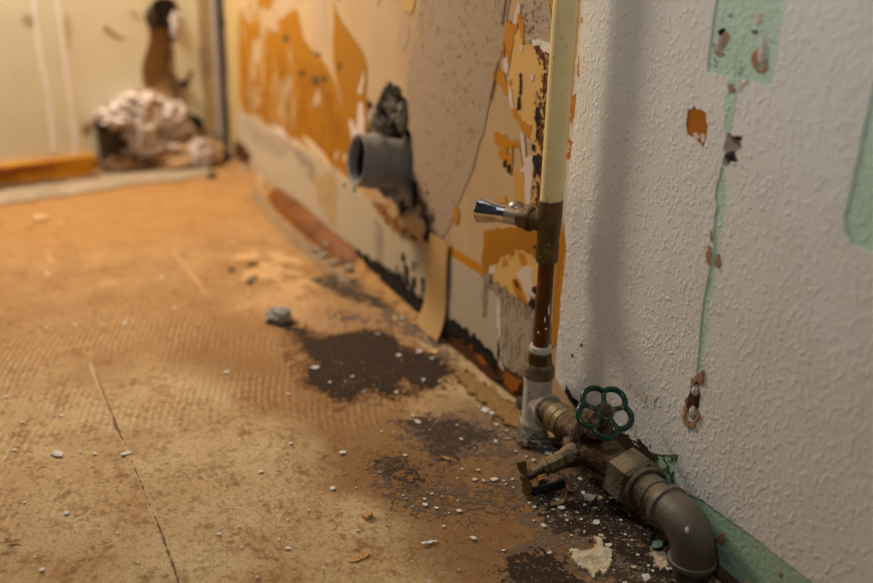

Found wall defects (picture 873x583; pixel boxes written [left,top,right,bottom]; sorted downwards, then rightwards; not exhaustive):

spalling [136,0,207,138]
peeling [238,0,390,176]
flaking render [372,182,427,240]
peeling [448,226,538,308]
peeling [493,3,549,205]
corrosion [531,41,549,208]
peeling [552,0,584,349]
leakage [705,231,721,269]
peeling [687,0,783,434]
leakage [227,217,679,583]